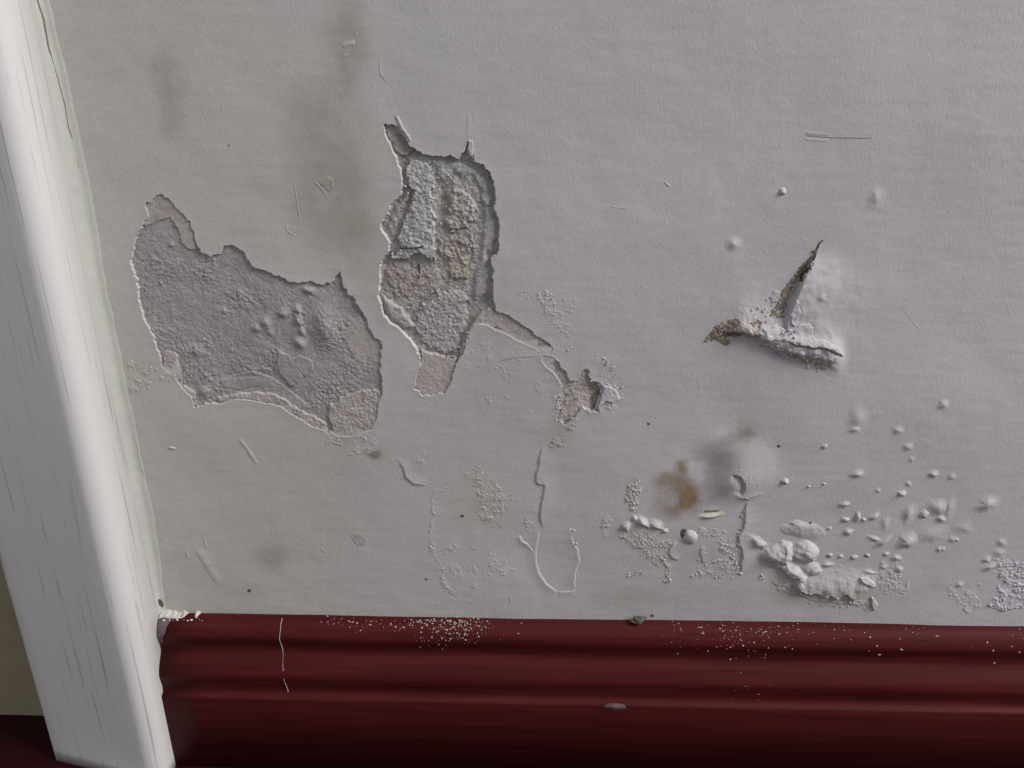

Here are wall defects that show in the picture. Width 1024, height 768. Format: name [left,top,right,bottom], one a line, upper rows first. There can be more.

peeling [123,116,620,443]
damp [624,476,642,513]
damp [677,467,696,508]
damp [600,515,672,583]
damp [686,527,740,579]
damp [945,556,1024,614]